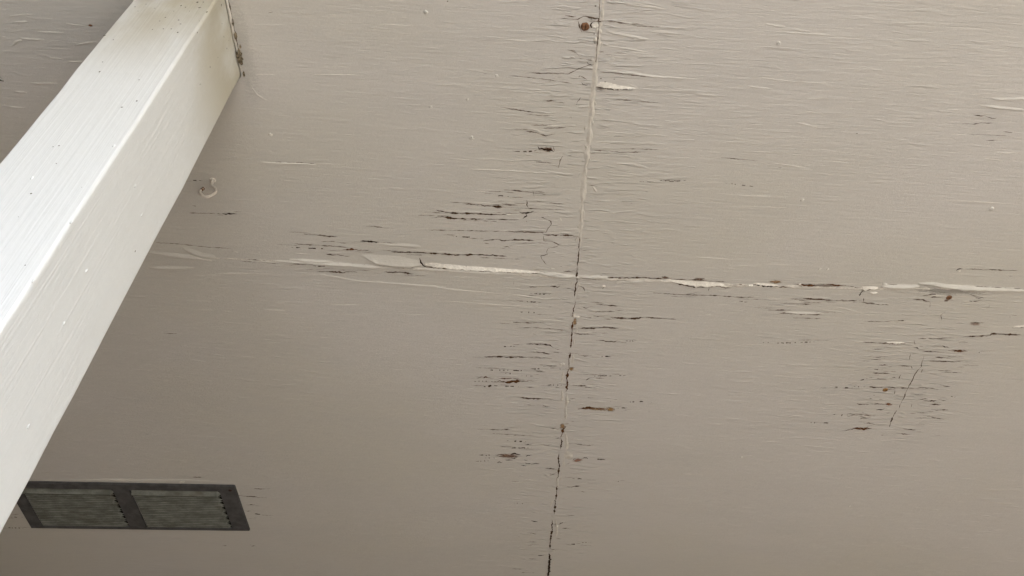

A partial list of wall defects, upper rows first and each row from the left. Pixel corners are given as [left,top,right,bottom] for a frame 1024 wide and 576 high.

peeling [596,82,635,90]
peeling [272,259,394,269]
peeling [421,263,539,276]
peeling [665,279,815,291]
peeling [828,284,878,296]
crack [156,190,1017,576]